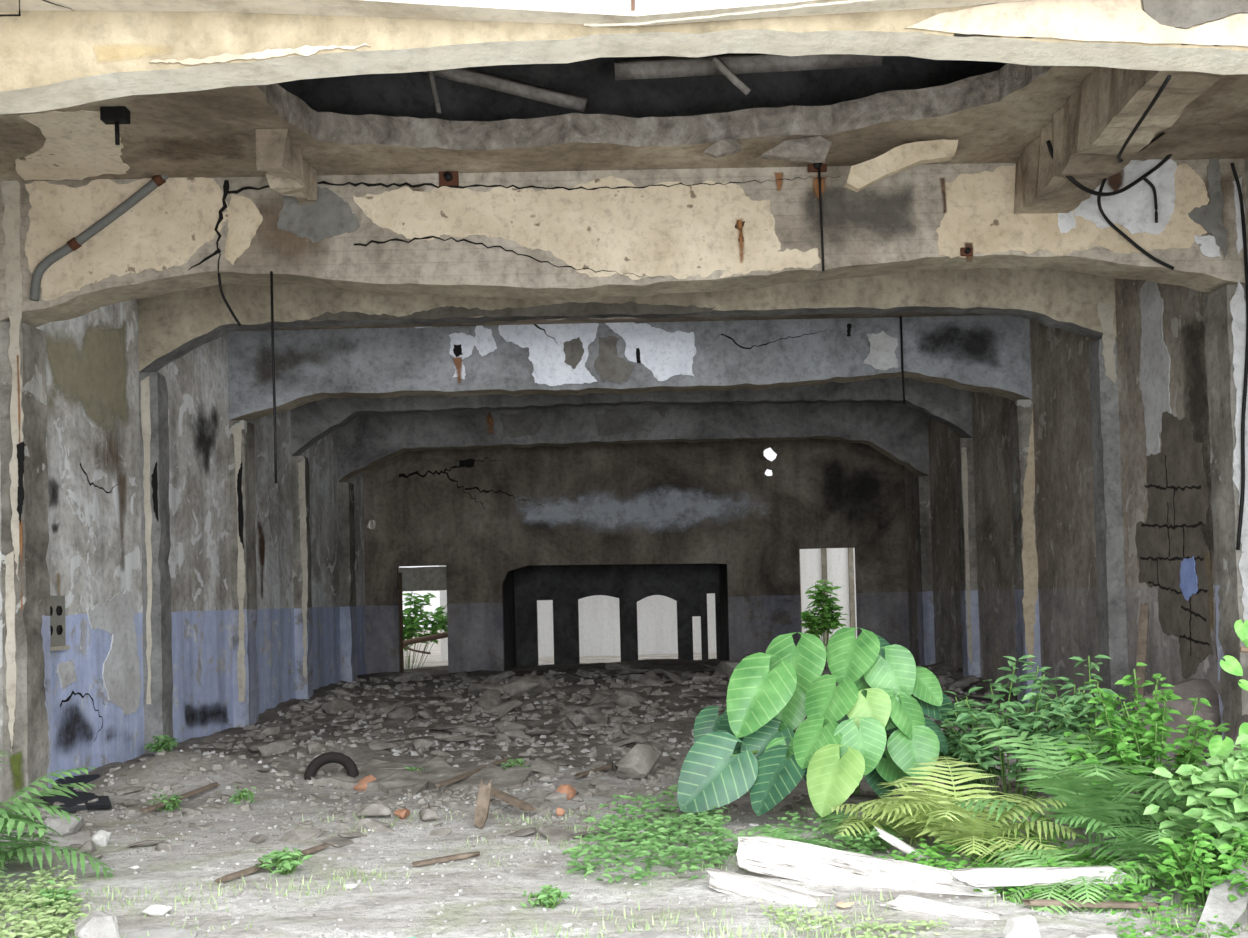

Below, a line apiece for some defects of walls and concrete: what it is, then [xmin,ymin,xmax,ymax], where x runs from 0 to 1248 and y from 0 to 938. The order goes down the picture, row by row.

peeling [584,0,1248,47]
crack [317,176,840,190]
spalling [844,139,958,192]
peeling [936,158,1245,258]
crack [354,236,664,279]
water stain [921,326,995,362]
peeling [1230,282,1248,622]
spalling [1135,281,1214,679]